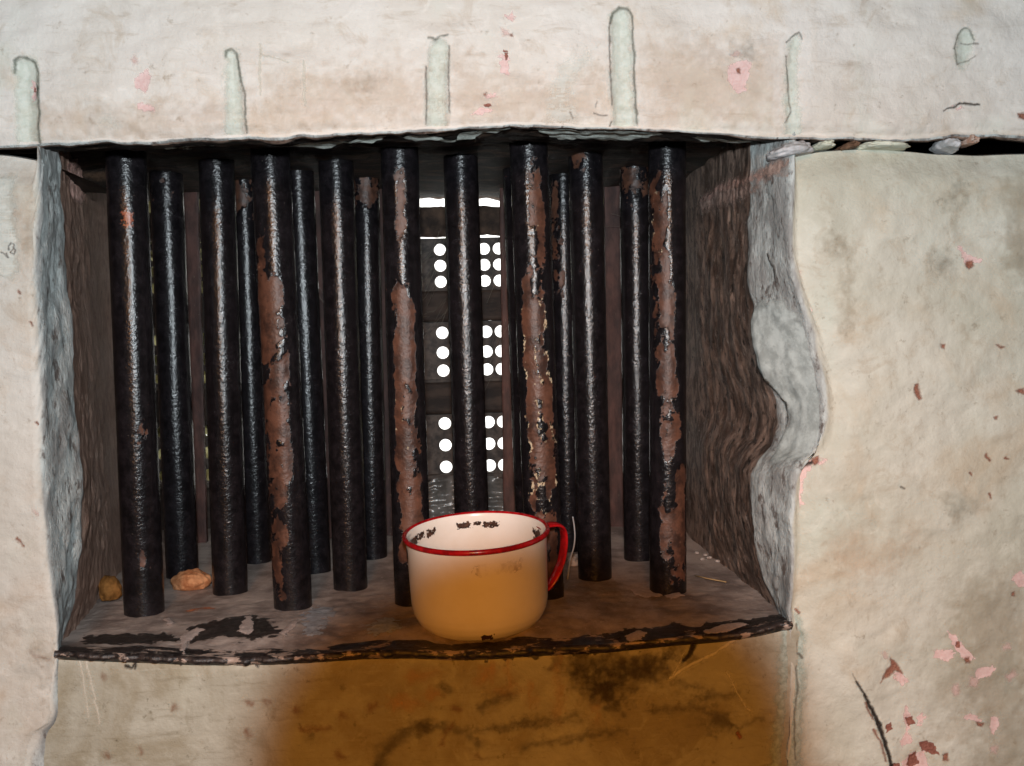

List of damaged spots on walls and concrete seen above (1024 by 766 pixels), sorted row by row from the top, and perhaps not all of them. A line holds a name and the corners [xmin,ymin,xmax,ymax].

peeling [80,607,337,666]
peeling [602,614,784,652]
peeling [881,652,909,686]
peeling [933,630,996,695]
crack [856,682,893,766]
peeling [885,705,948,766]
peeling [963,714,999,753]